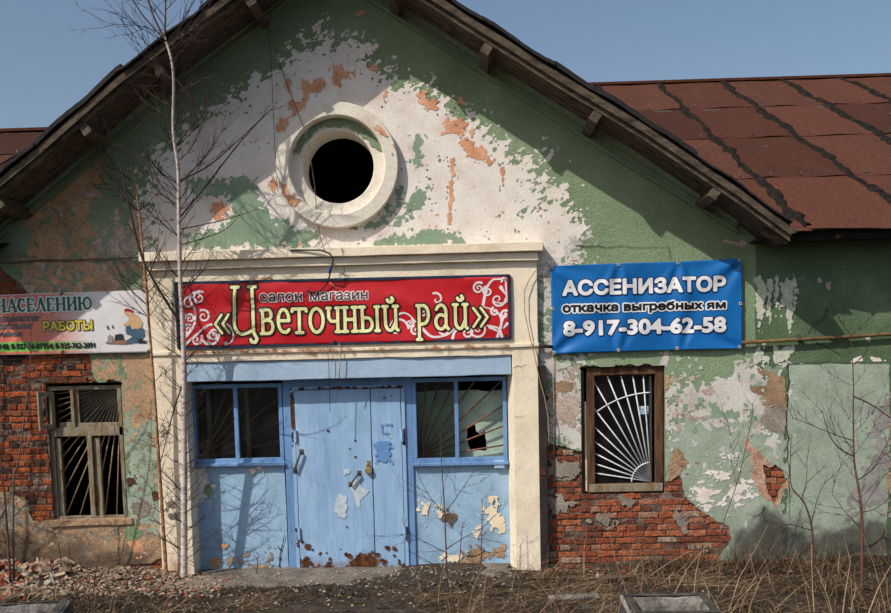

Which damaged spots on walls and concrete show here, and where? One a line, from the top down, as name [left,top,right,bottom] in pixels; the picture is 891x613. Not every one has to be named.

peeling [9,12,599,450]
peeling [0,353,181,569]
peeling [651,350,891,561]
rust [295,528,334,568]
rust [340,545,405,567]
spalling [415,498,459,528]
spalling [439,495,506,564]
spalling [619,593,721,613]